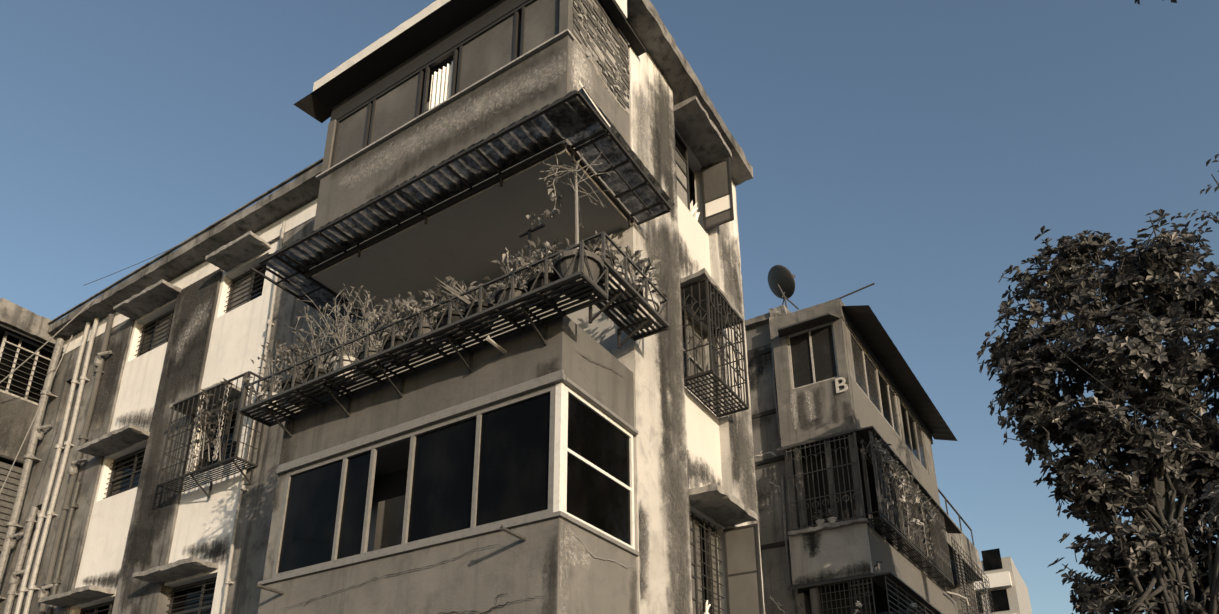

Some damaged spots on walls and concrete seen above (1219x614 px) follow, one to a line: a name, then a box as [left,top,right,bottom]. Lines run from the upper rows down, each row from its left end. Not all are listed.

leakage [634,73,768,614]
leakage [747,347,772,390]
leakage [631,505,648,611]